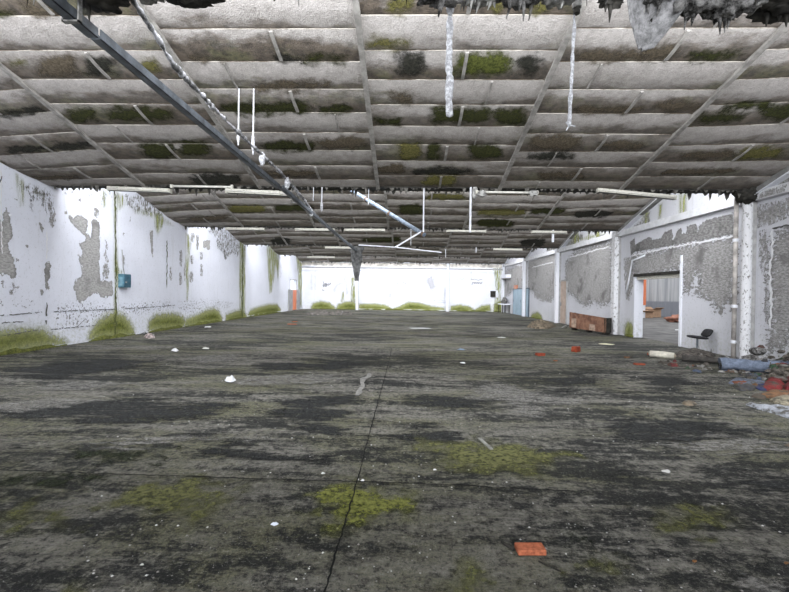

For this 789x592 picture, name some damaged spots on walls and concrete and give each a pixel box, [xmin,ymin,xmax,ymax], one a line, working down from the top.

mould [393,50,427,77]
mould [516,52,544,77]
damp [107,105,173,122]
damp [493,107,528,125]
damp [373,163,473,175]
peeling [0,207,19,294]
peeling [56,208,113,326]
peeling [505,252,555,303]
peeling [565,234,612,309]
peeling [624,212,741,317]
peeling [757,178,789,357]
crack [0,349,579,592]